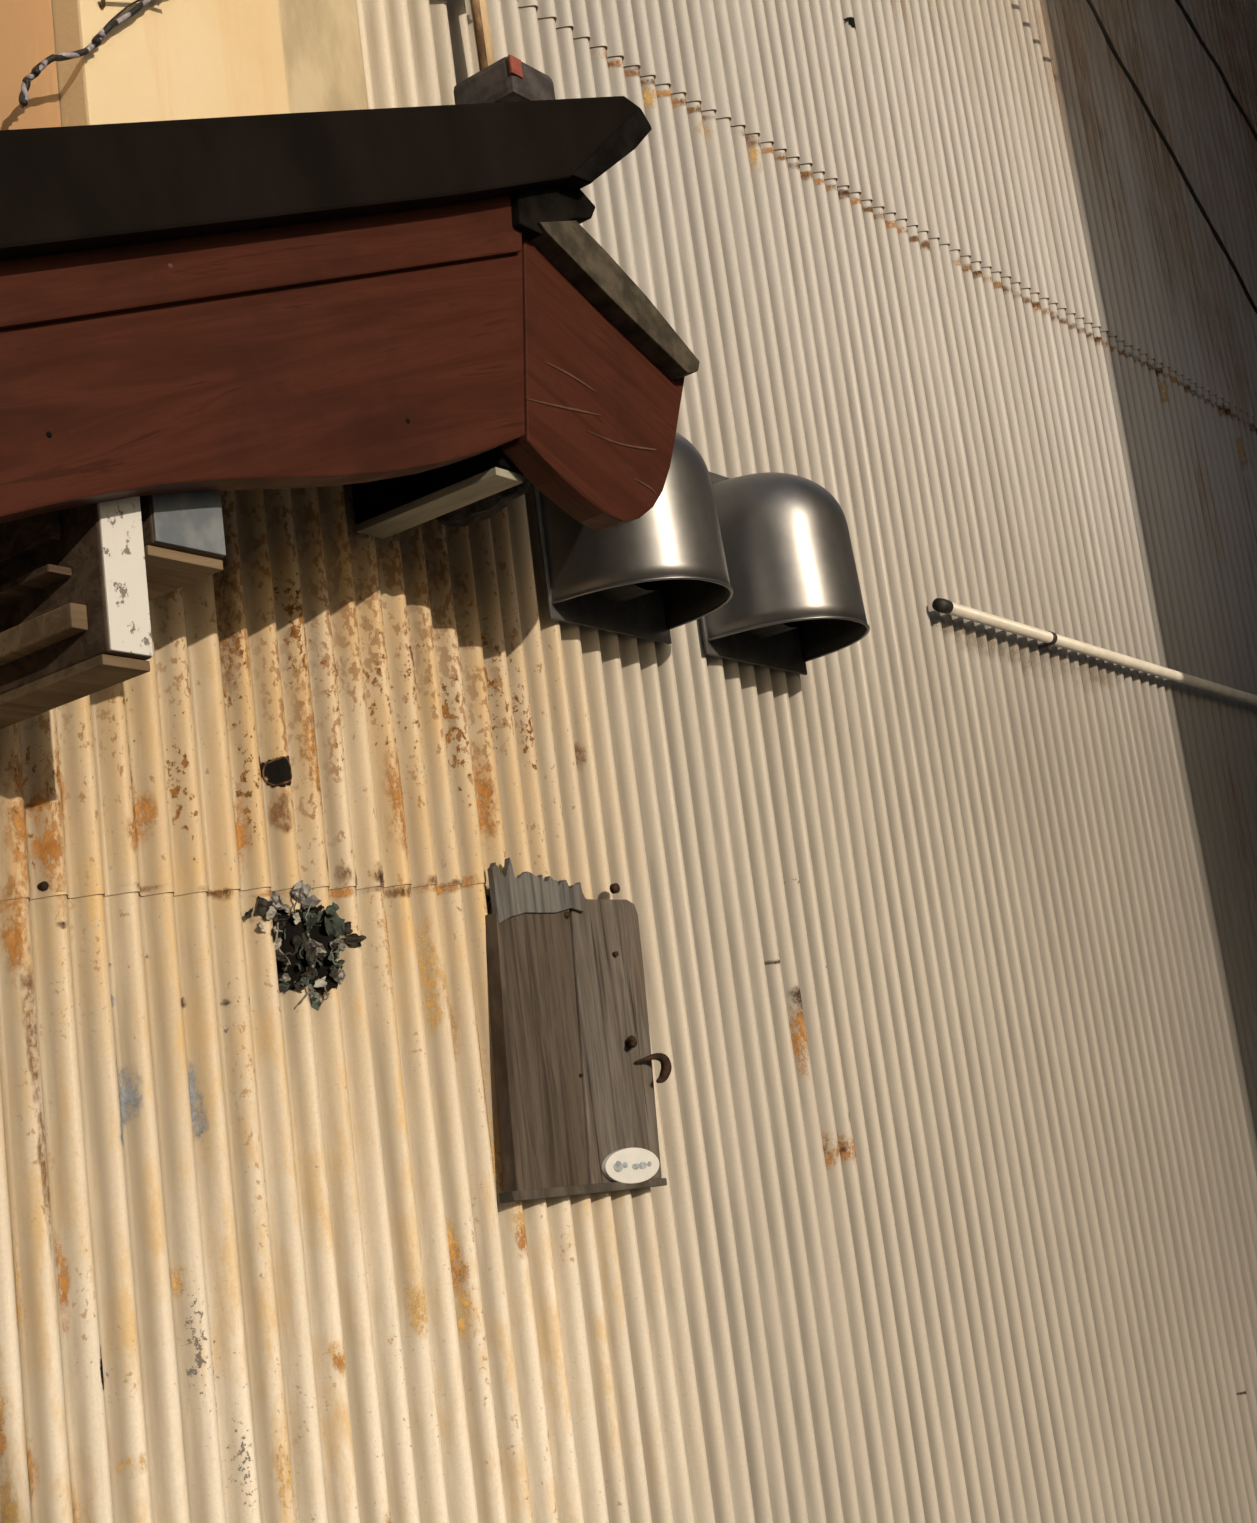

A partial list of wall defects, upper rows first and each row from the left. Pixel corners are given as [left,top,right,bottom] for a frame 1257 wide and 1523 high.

rust [606,52,705,134]
rust [745,135,931,250]
rust [957,259,1257,465]
rust [213,559,262,856]
rust [272,561,342,721]
rust [358,579,494,847]
rust [481,617,540,787]
rust [1,738,64,1079]
peeling [244,880,367,1011]
rust [375,867,486,897]
rust [789,988,808,1065]
rust [39,1113,50,1207]